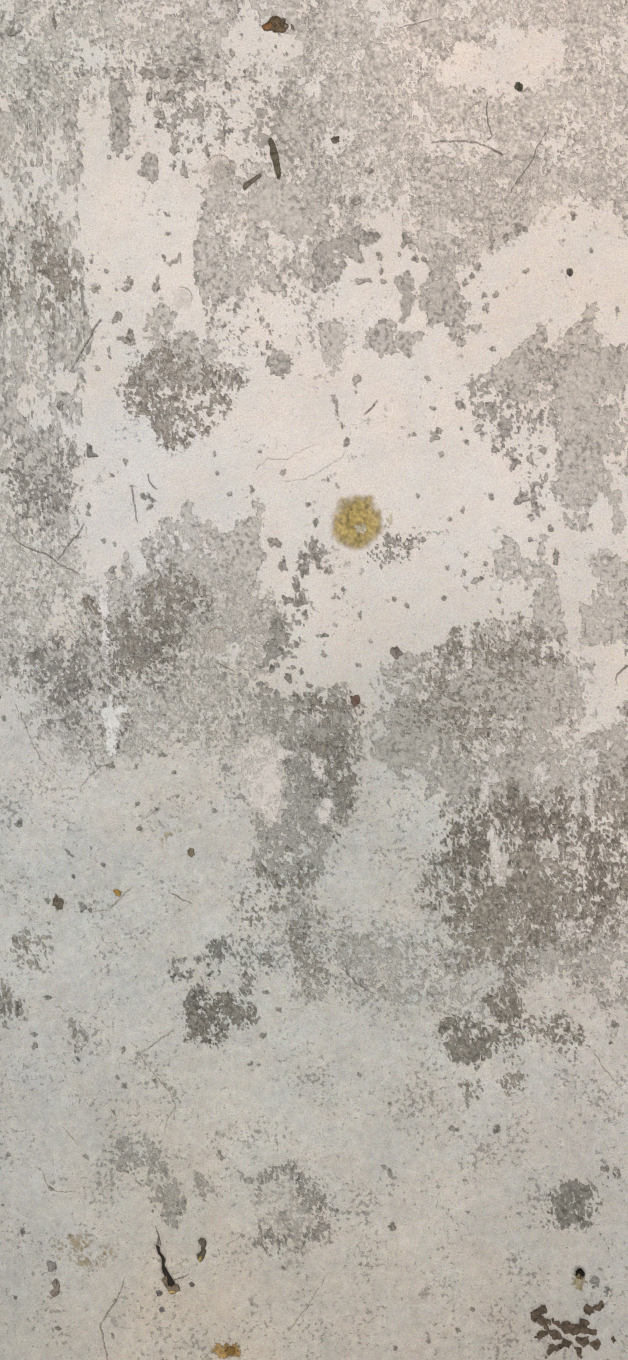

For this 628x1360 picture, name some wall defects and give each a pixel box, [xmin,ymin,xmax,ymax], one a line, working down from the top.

crack [155,1227,194,1312]
crack [99,1283,123,1357]